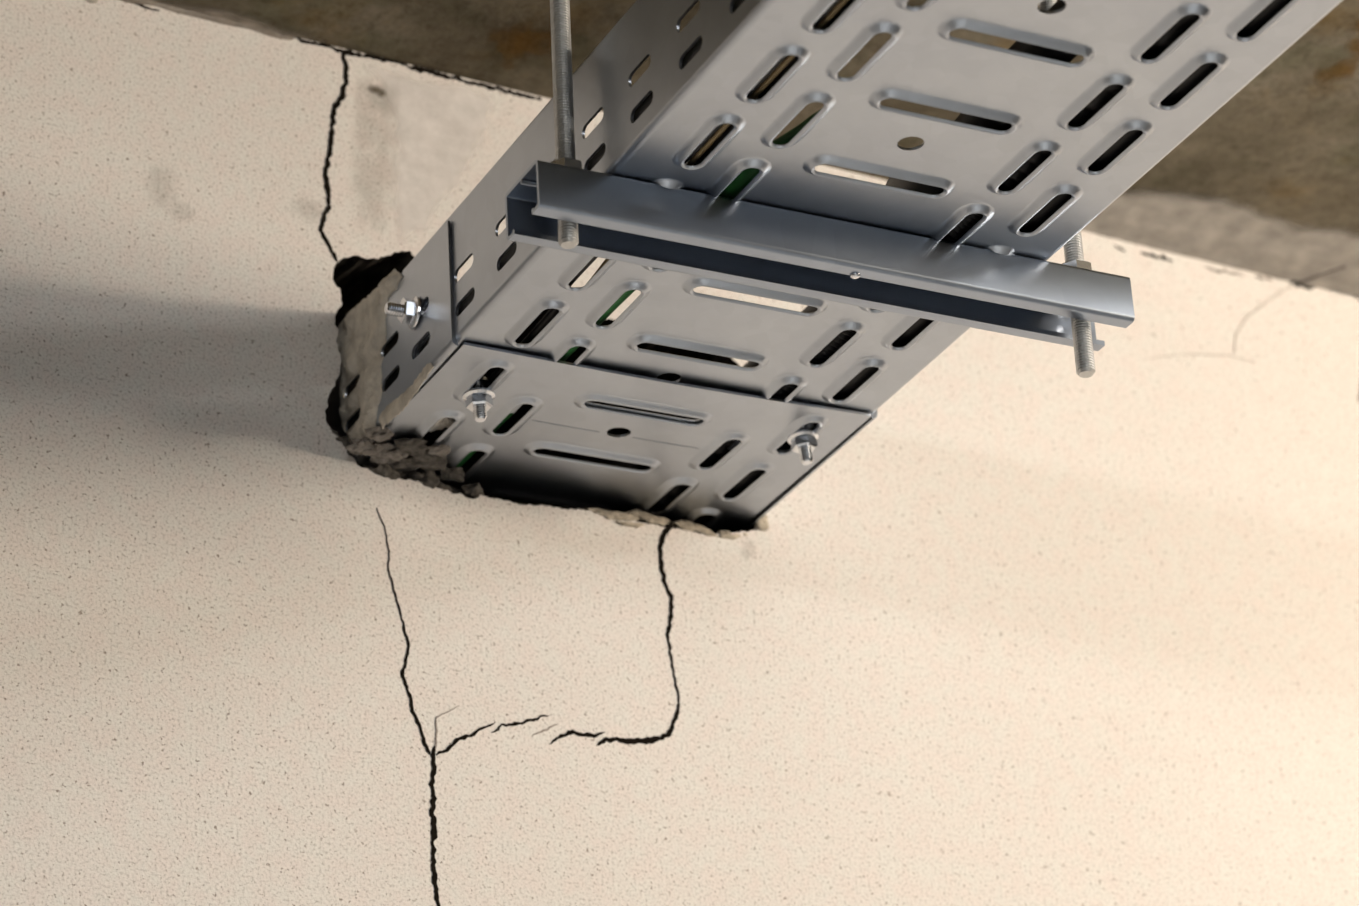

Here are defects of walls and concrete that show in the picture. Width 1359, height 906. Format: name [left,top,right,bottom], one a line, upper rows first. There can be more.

crack [279,32,542,262]
spalling [333,251,414,327]
spalling [515,309,550,344]
spalling [383,333,399,357]
spalling [565,346,586,363]
spalling [637,343,739,366]
spalling [657,373,681,381]
spalling [495,404,533,433]
spalling [588,401,688,419]
spalling [331,410,769,540]
crack [377,509,680,906]